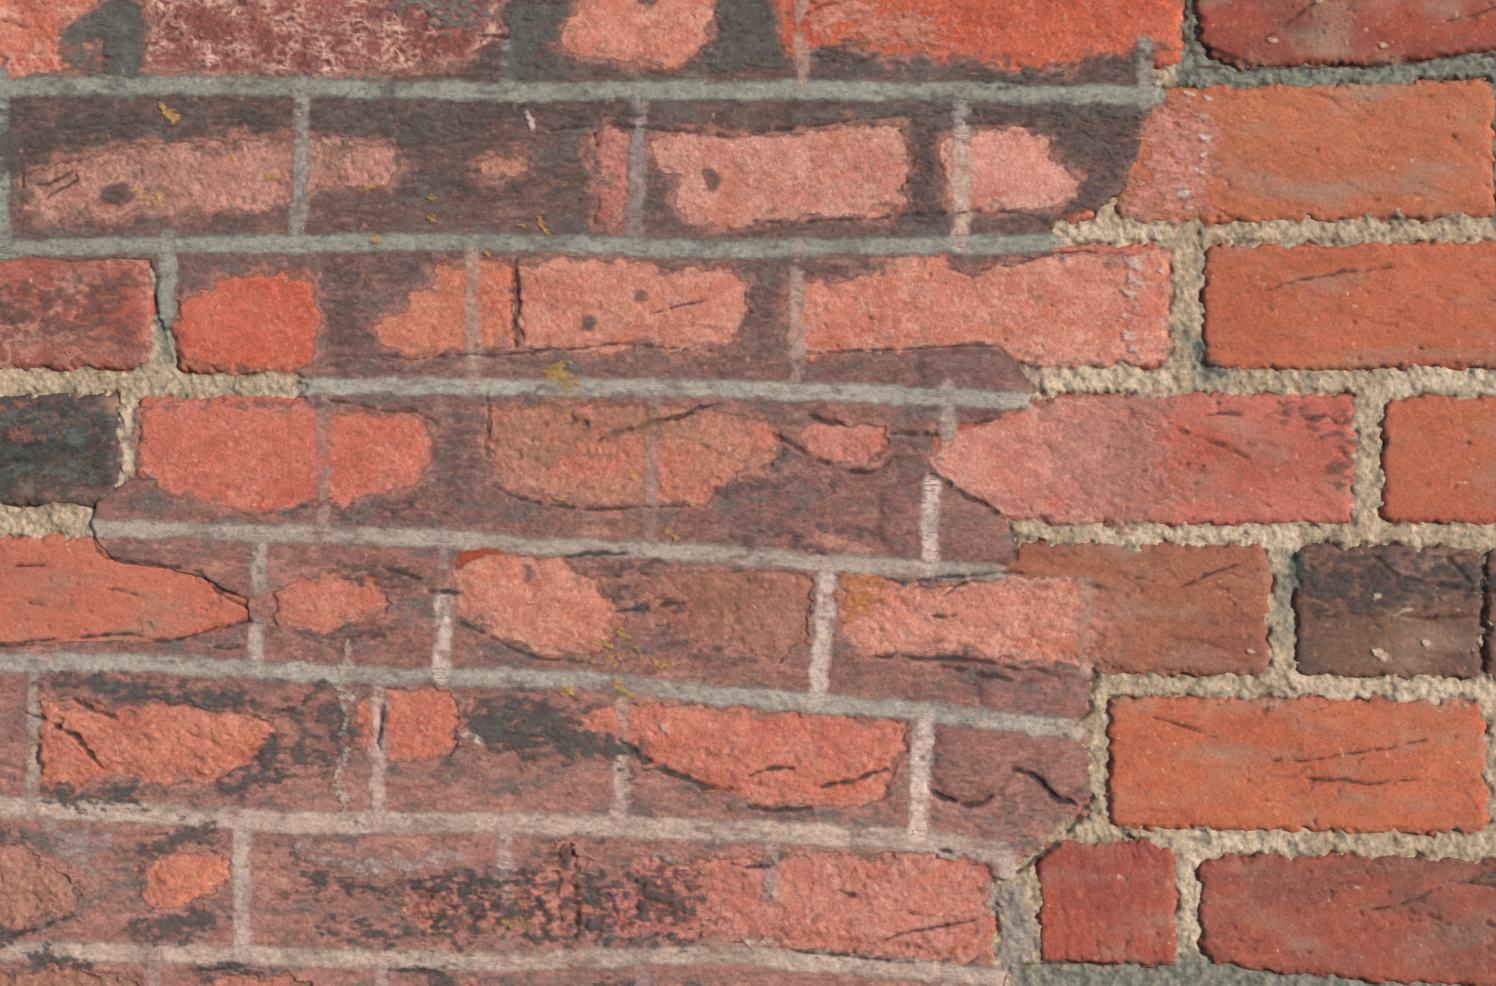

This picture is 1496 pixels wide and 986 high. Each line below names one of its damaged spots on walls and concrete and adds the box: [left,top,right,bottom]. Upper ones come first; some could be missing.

spalling [558,0,718,70]
spalling [775,0,1185,73]
spalling [650,124,913,228]
spalling [373,254,750,360]
spalling [785,246,1175,369]
spalling [135,400,434,515]
spalling [483,400,889,510]
spalling [448,549,628,659]
spalling [636,569,1118,669]
spalling [21,697,283,795]
spalling [569,702,910,809]
spalling [399,840,992,966]